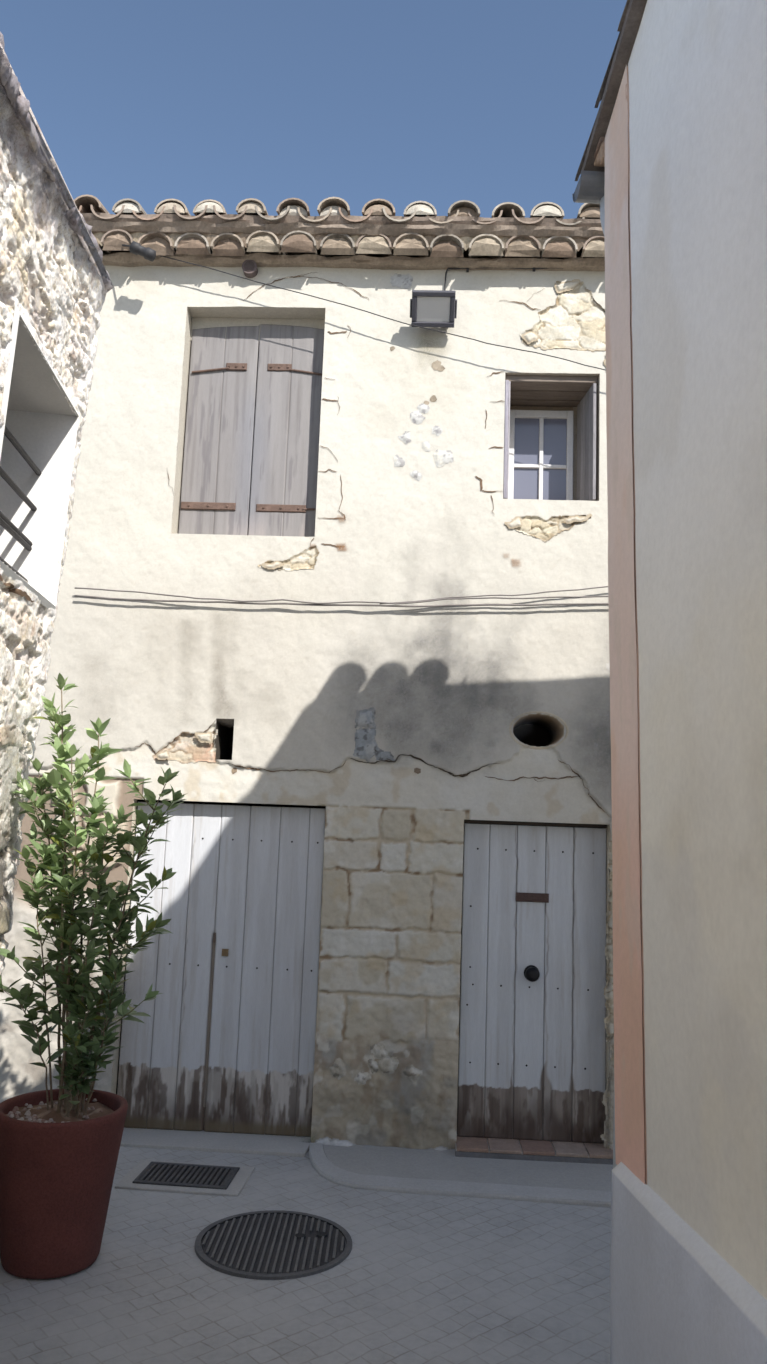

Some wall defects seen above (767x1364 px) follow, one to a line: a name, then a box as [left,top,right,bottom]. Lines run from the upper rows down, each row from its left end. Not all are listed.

spalling [520,279,606,366]
spalling [504,514,592,542]
spalling [258,545,319,571]
crack [136,720,216,754]
spalling [153,729,218,764]
crack [234,750,608,815]
spalling [600,838,614,1150]